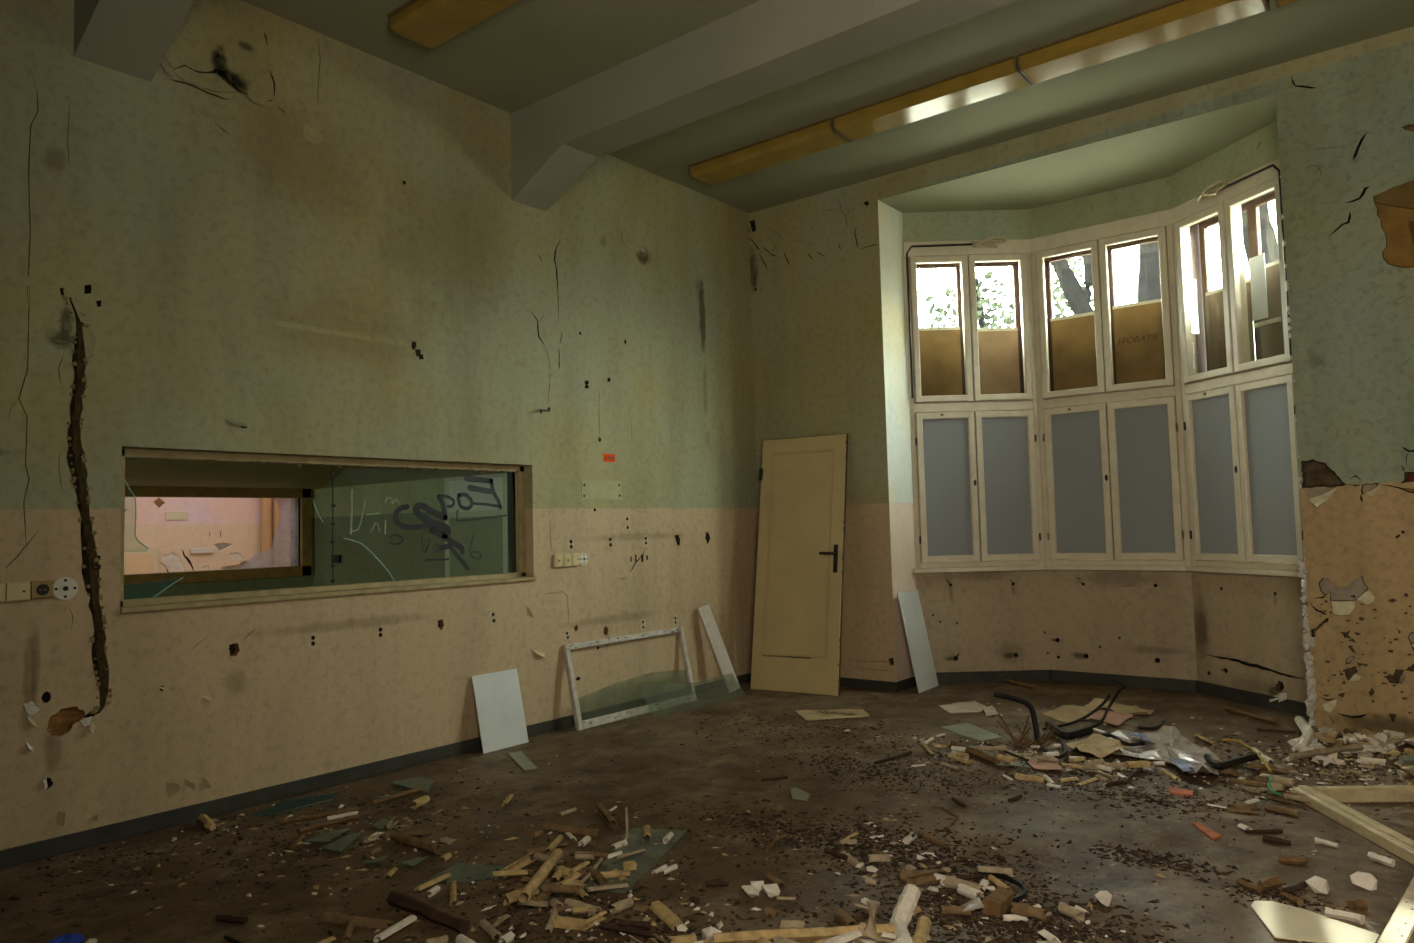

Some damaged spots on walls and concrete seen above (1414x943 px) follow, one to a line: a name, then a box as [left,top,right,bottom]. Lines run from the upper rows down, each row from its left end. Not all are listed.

peeling [1373,180,1414,268]
crack [8,68,112,718]
flaking render [1297,454,1380,507]
flaking render [1400,472,1414,493]
flaking render [1297,549,1414,727]
flaking render [23,691,96,737]
crack [1209,655,1306,679]
flaking render [1269,681,1287,702]